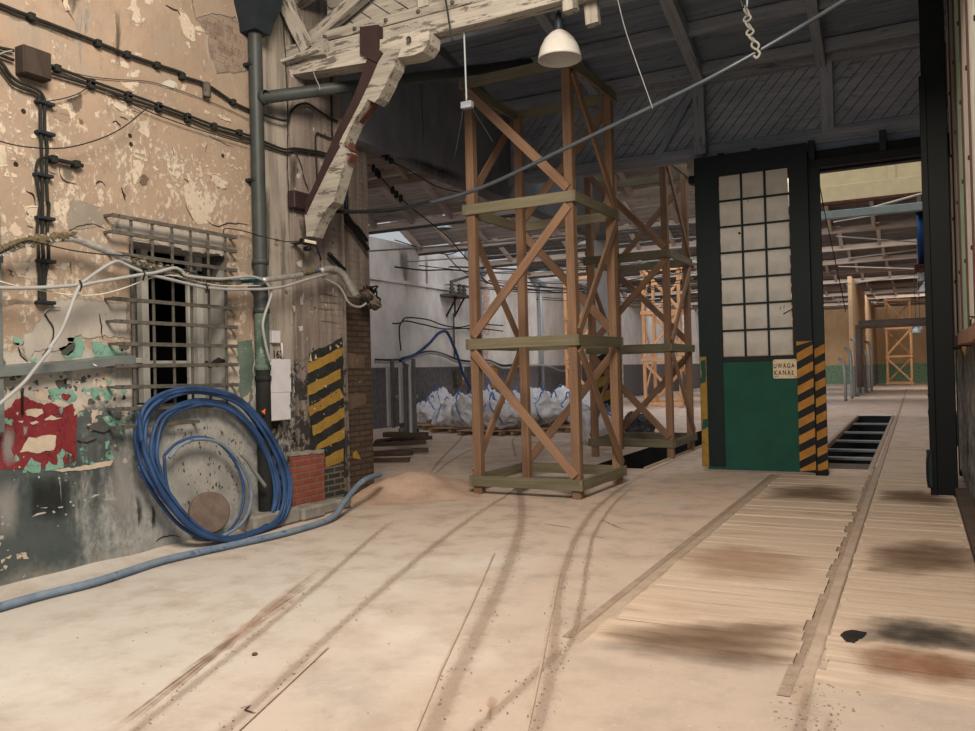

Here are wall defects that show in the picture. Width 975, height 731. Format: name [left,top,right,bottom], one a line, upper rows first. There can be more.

peeling [127,0,152,26]
flaking render [177,0,247,74]
peeling [111,52,142,93]
peeling [0,109,37,178]
flaking render [105,93,243,266]
flaking render [2,256,132,362]
water stain [3,434,13,458]
peeling [3,358,134,481]
water stain [34,479,67,514]
peeling [0,516,29,571]